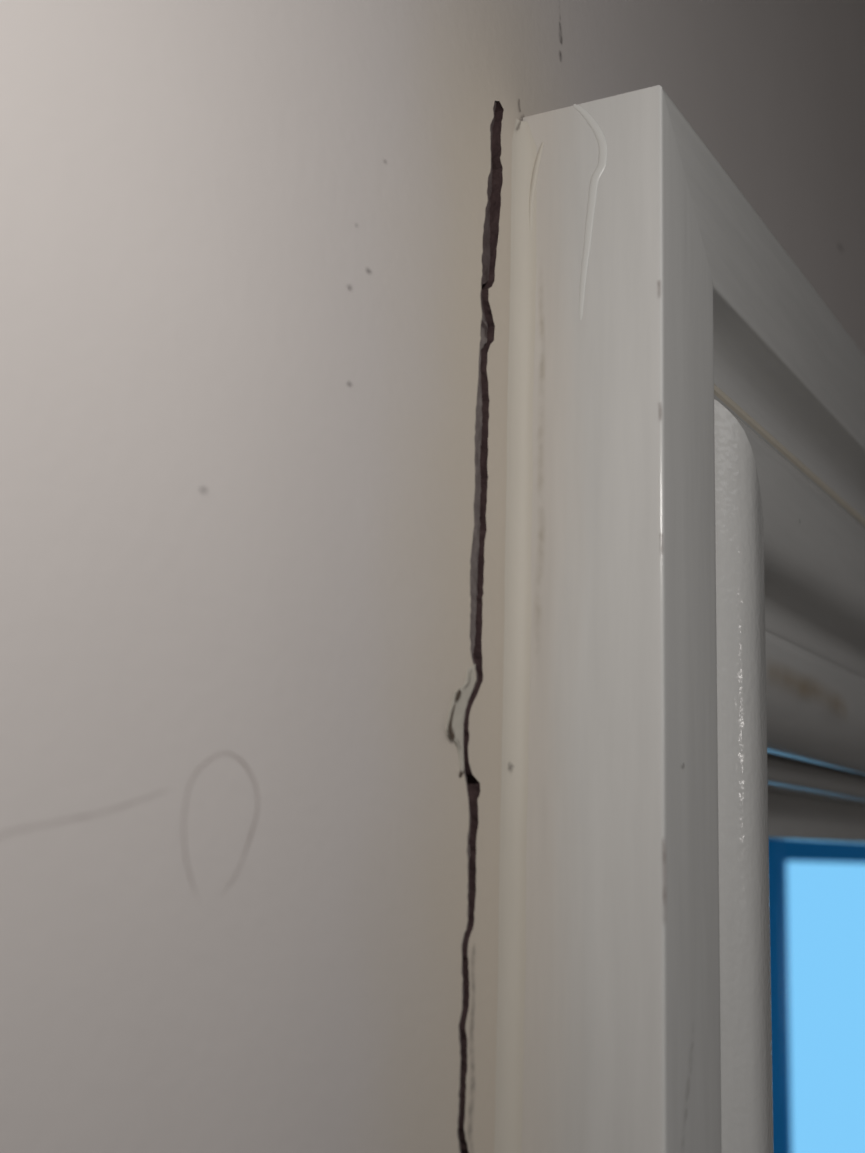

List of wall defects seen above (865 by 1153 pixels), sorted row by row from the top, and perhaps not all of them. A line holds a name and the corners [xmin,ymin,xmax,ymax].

crack [457,99,523,1153]